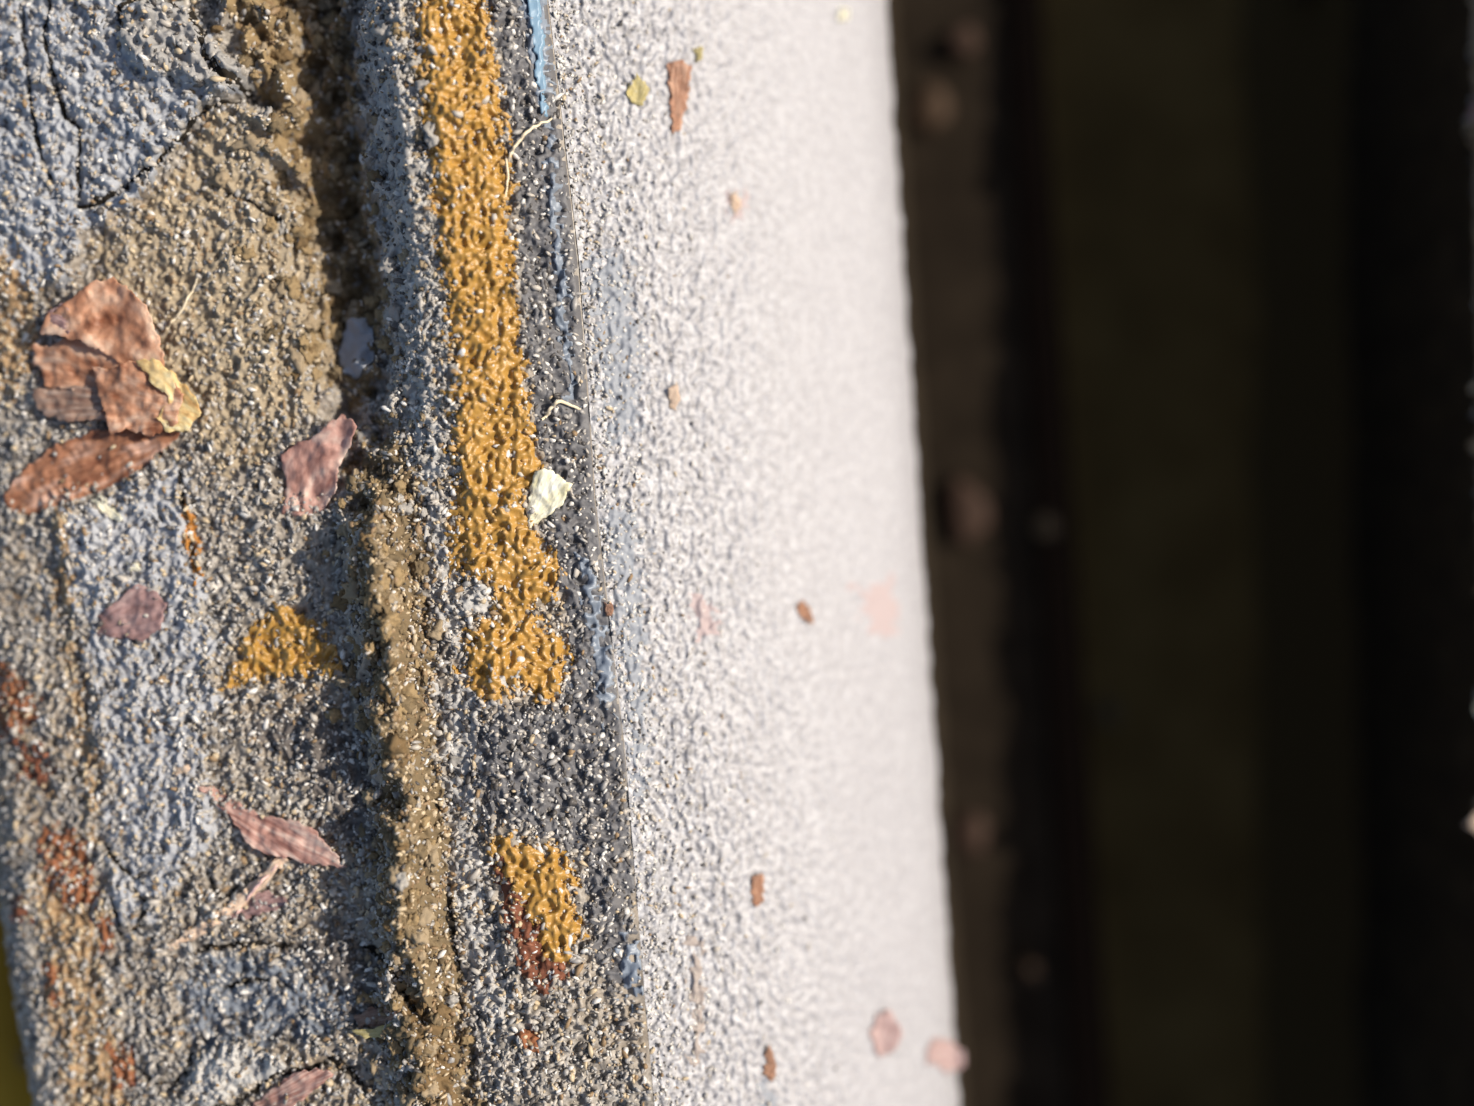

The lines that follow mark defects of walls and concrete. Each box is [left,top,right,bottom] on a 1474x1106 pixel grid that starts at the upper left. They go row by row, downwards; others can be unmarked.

crack [19,0,255,210]